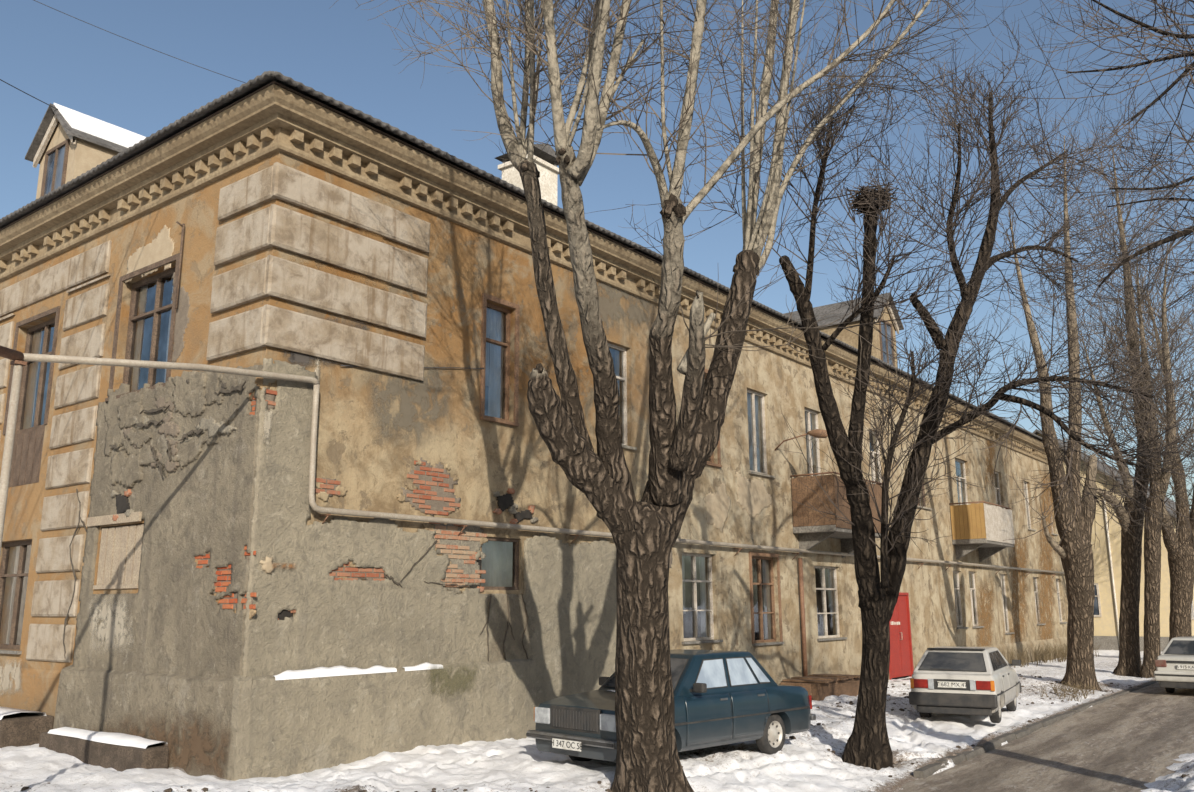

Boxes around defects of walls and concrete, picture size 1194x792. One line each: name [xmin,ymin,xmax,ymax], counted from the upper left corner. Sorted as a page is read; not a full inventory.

spalling [315,478,347,501]
spalling [396,457,488,594]
spalling [195,551,257,619]
spalling [244,545,275,574]
spalling [329,560,387,581]